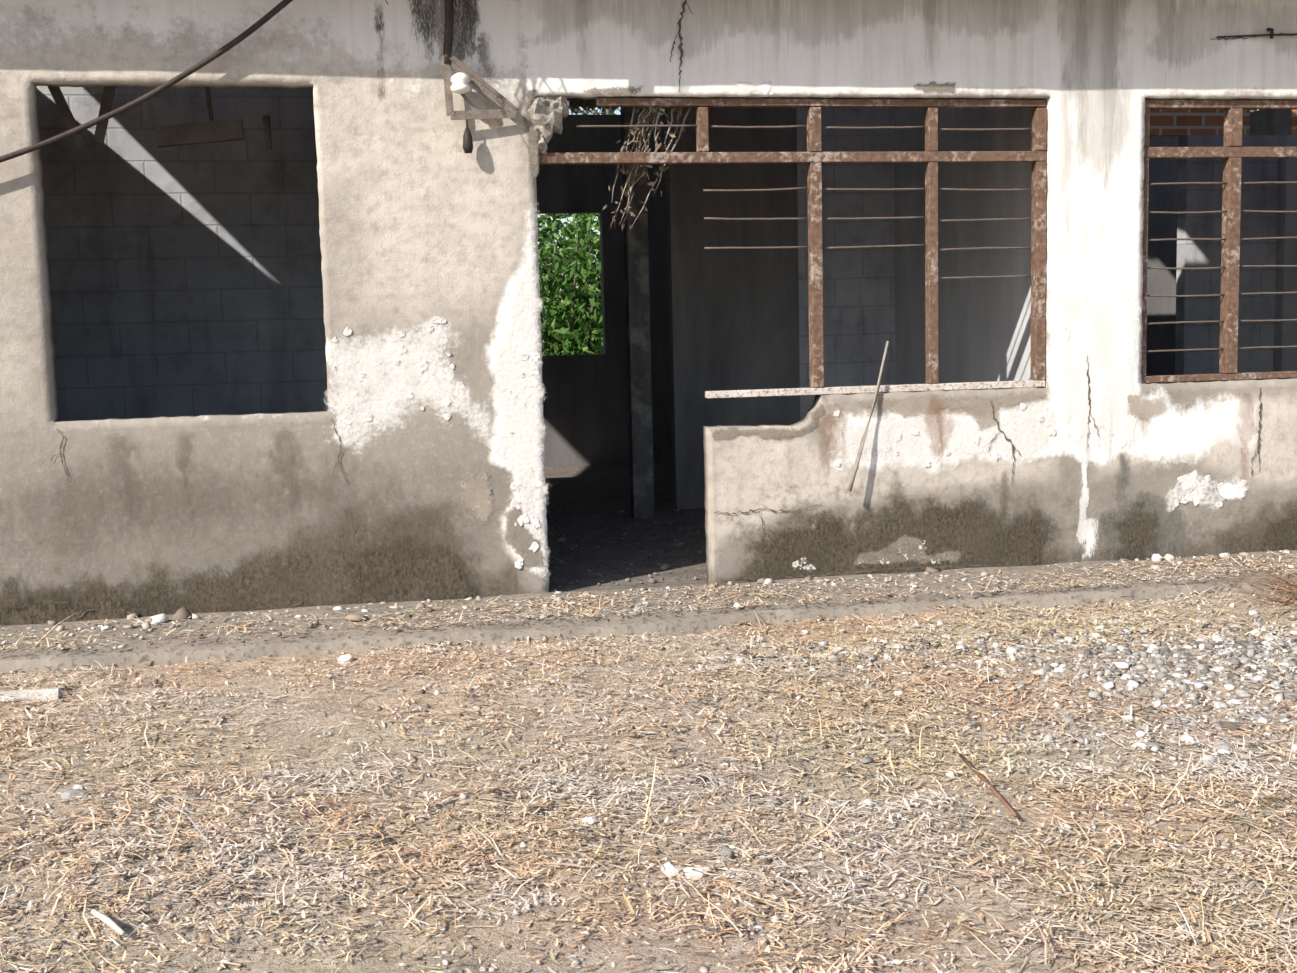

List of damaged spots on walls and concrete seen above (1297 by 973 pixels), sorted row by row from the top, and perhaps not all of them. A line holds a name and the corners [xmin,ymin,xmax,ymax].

leakage [455,0,490,75]
crack [670,0,694,92]
spalling [736,82,774,95]
spalling [914,81,955,93]
spalling [523,89,569,177]
peeling [326,246,548,576]
crack [989,400,1022,487]
leakage [1077,430,1098,558]
leakage [1116,455,1129,489]
peeling [1167,470,1248,512]
crack [1251,388,1262,478]
leakage [0,552,317,625]